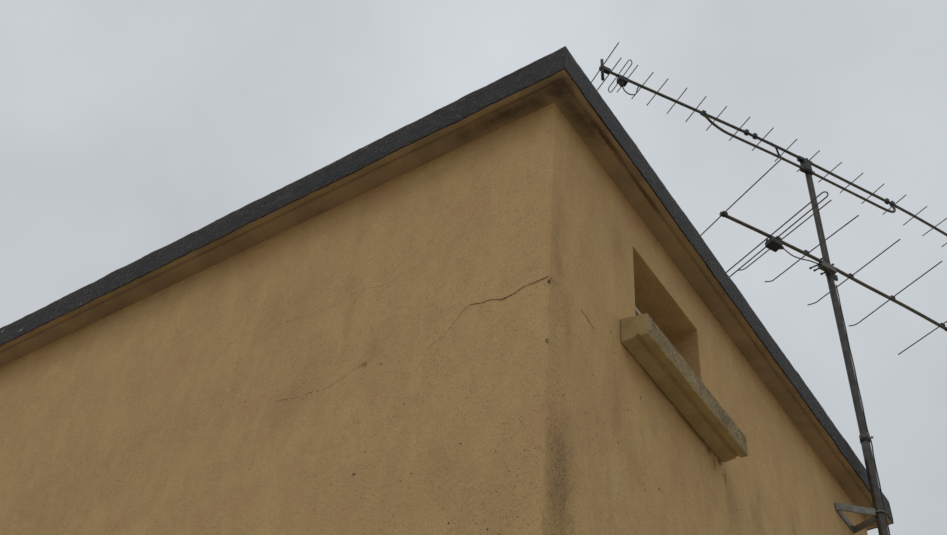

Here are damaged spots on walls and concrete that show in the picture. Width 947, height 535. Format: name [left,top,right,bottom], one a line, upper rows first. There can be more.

crack [470,276,556,305]